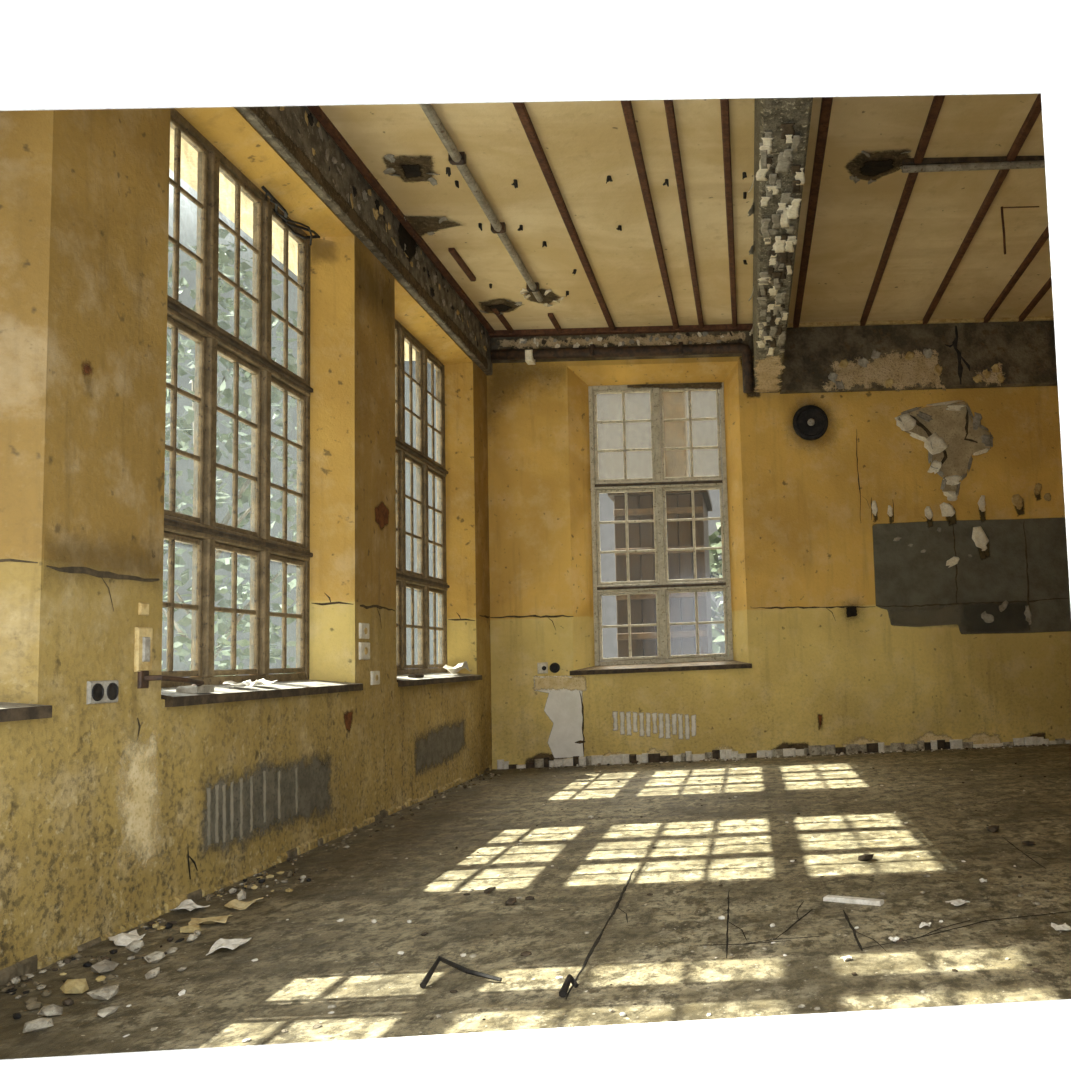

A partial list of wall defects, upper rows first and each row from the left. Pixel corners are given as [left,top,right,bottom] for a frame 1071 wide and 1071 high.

peeling [280,106,345,175]
peeling [347,123,805,393]
flaking render [821,348,1071,634]
crack [0,559,160,611]
spalling [526,676,586,762]